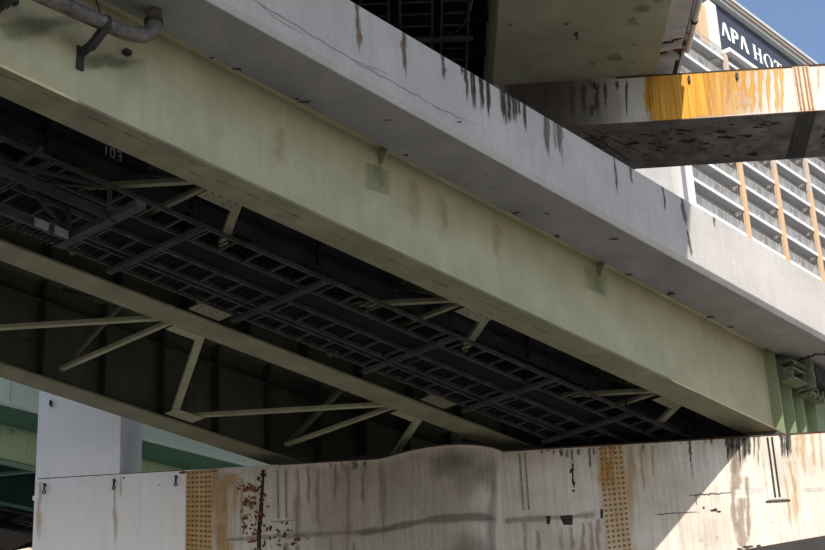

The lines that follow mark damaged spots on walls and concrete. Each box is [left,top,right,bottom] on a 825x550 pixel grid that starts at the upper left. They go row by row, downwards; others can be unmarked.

water stain [460,66,628,158]
corrosion [563,64,825,128]
crack [797,353,825,361]
corrosion [278,431,825,485]
water stain [778,435,791,455]
water stain [725,436,764,547]